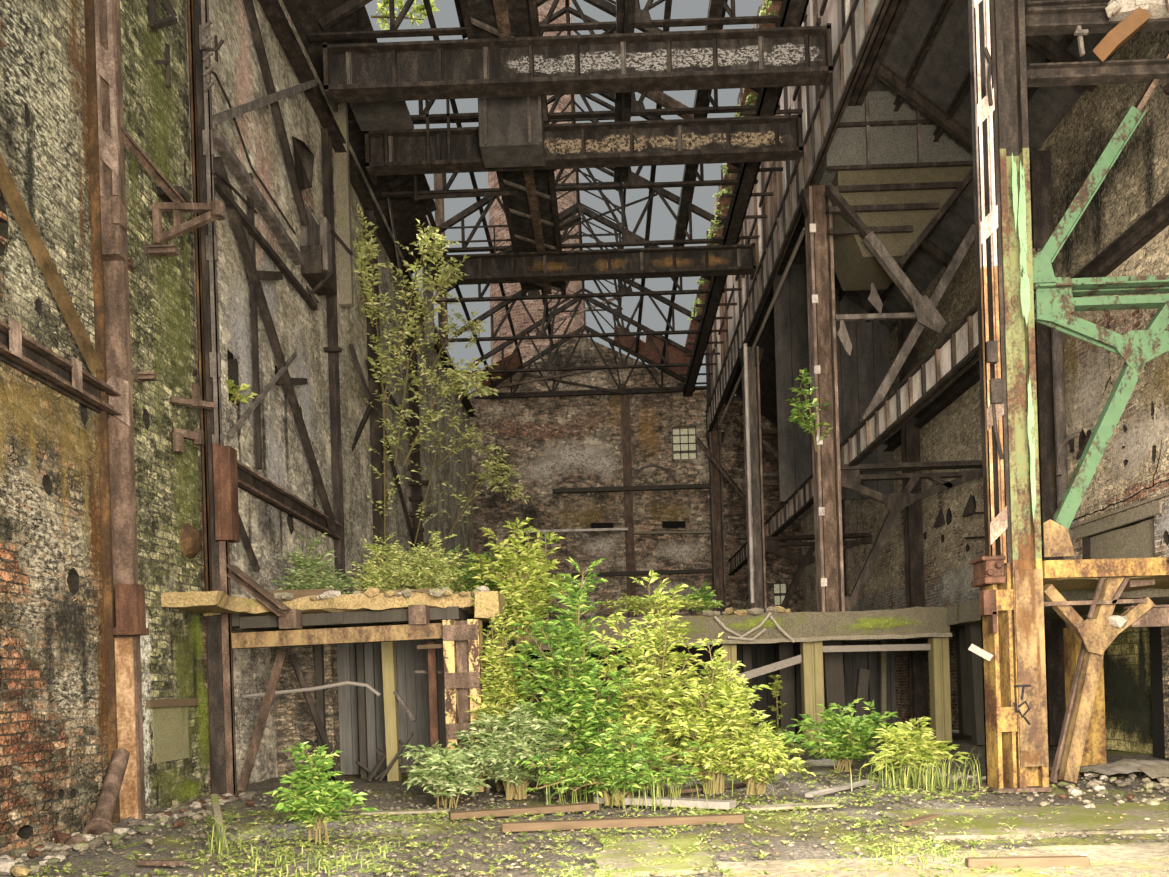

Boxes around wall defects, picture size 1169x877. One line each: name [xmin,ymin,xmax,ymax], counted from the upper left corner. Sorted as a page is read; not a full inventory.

peeling [0,2,76,228]
peeling [0,211,45,313]
peeling [1012,153,1030,324]
peeling [1028,379,1036,520]
peeling [1076,340,1111,423]
spalling [1093,309,1158,335]
peeling [1115,412,1169,466]
peeling [0,471,86,626]
water stain [46,593,88,698]
rust [1019,539,1041,680]
spalling [0,638,95,851]